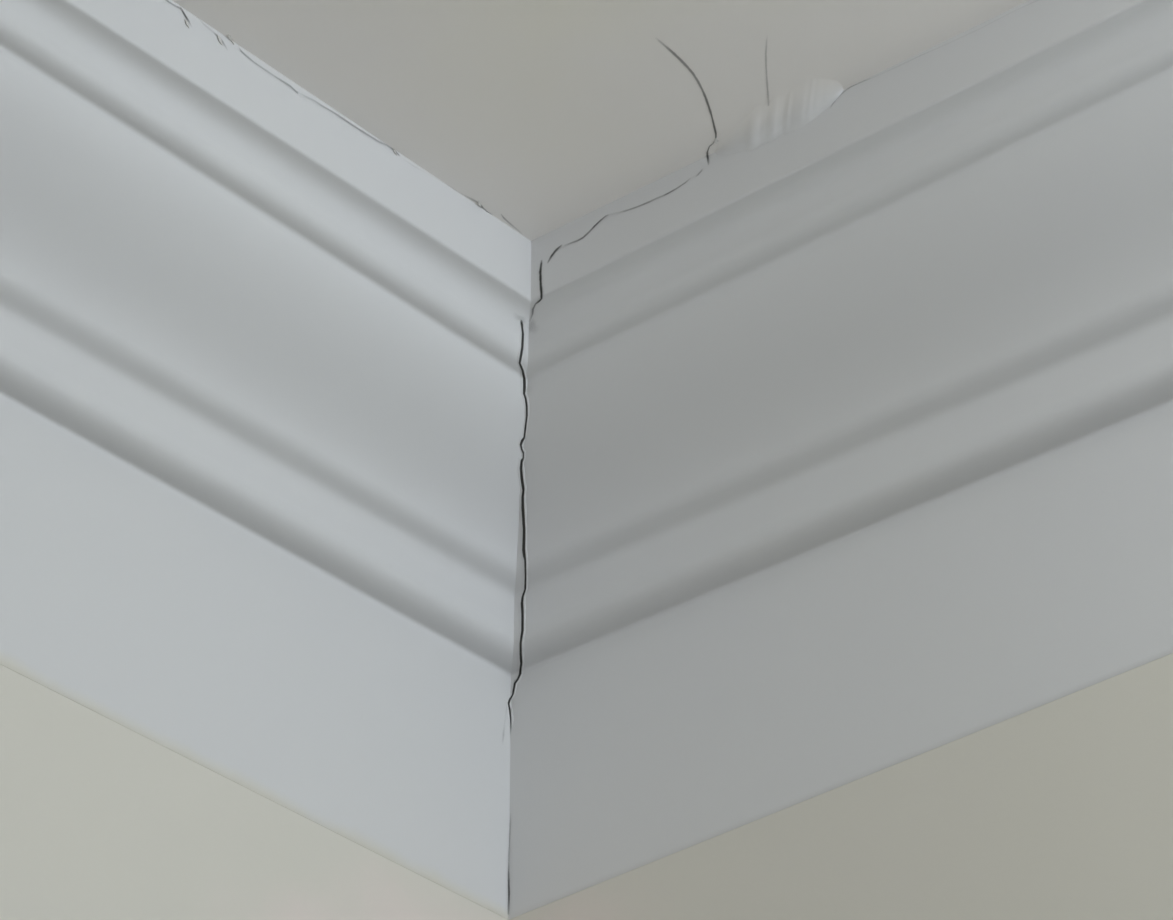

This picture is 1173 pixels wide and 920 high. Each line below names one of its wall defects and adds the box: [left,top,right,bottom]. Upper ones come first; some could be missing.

crack [703,92,719,160]
crack [506,217,604,734]